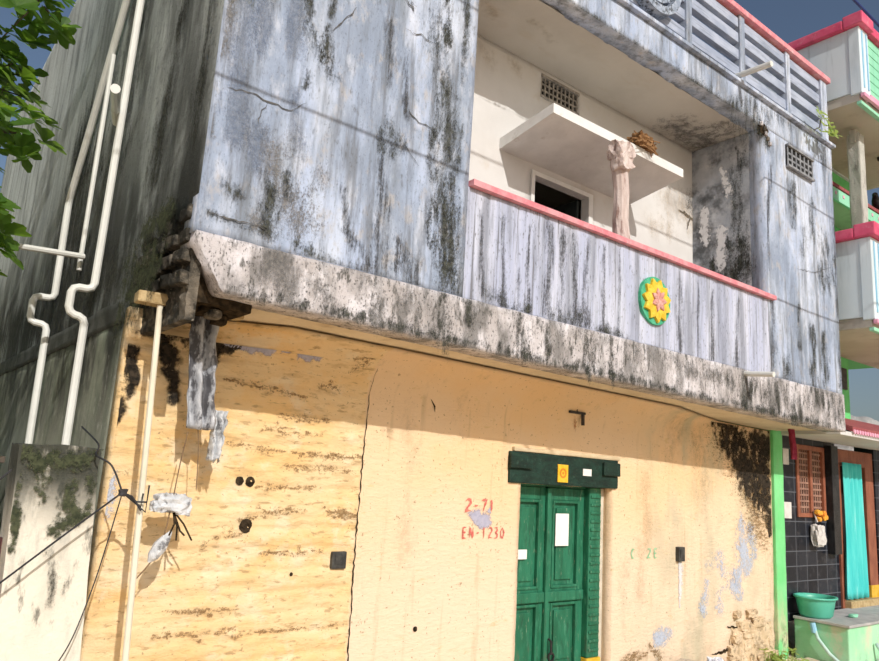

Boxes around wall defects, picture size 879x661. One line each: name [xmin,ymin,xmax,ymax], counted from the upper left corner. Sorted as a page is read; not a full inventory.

crack [228,87,305,123]
leakage [543,225,649,386]
leakage [117,344,140,425]
leakage [139,331,189,405]
peeling [226,344,323,362]
leakage [735,301,844,427]
leakage [7,473,22,553]
leakage [34,470,97,538]
crack [347,369,378,661]
peeling [468,508,492,529]
leakage [708,422,772,554]
peeling [700,516,757,617]